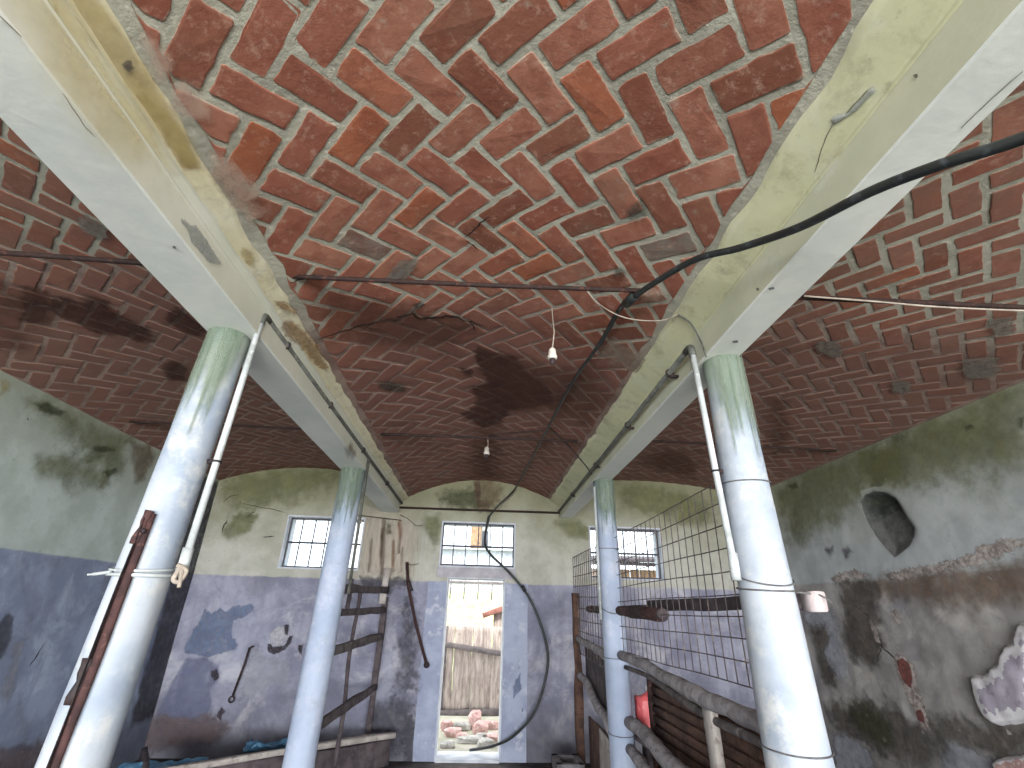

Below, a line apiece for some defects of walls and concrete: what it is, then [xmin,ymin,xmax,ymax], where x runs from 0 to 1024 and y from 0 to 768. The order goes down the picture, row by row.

water stain [21,287,149,341]
water stain [163,308,237,428]
corrosion [276,302,328,369]
crack [318,303,481,340]
water stain [461,348,552,427]
spalling [862,491,915,557]
peeling [886,538,1024,580]
peeling [162,604,253,720]
spalling [895,654,930,730]